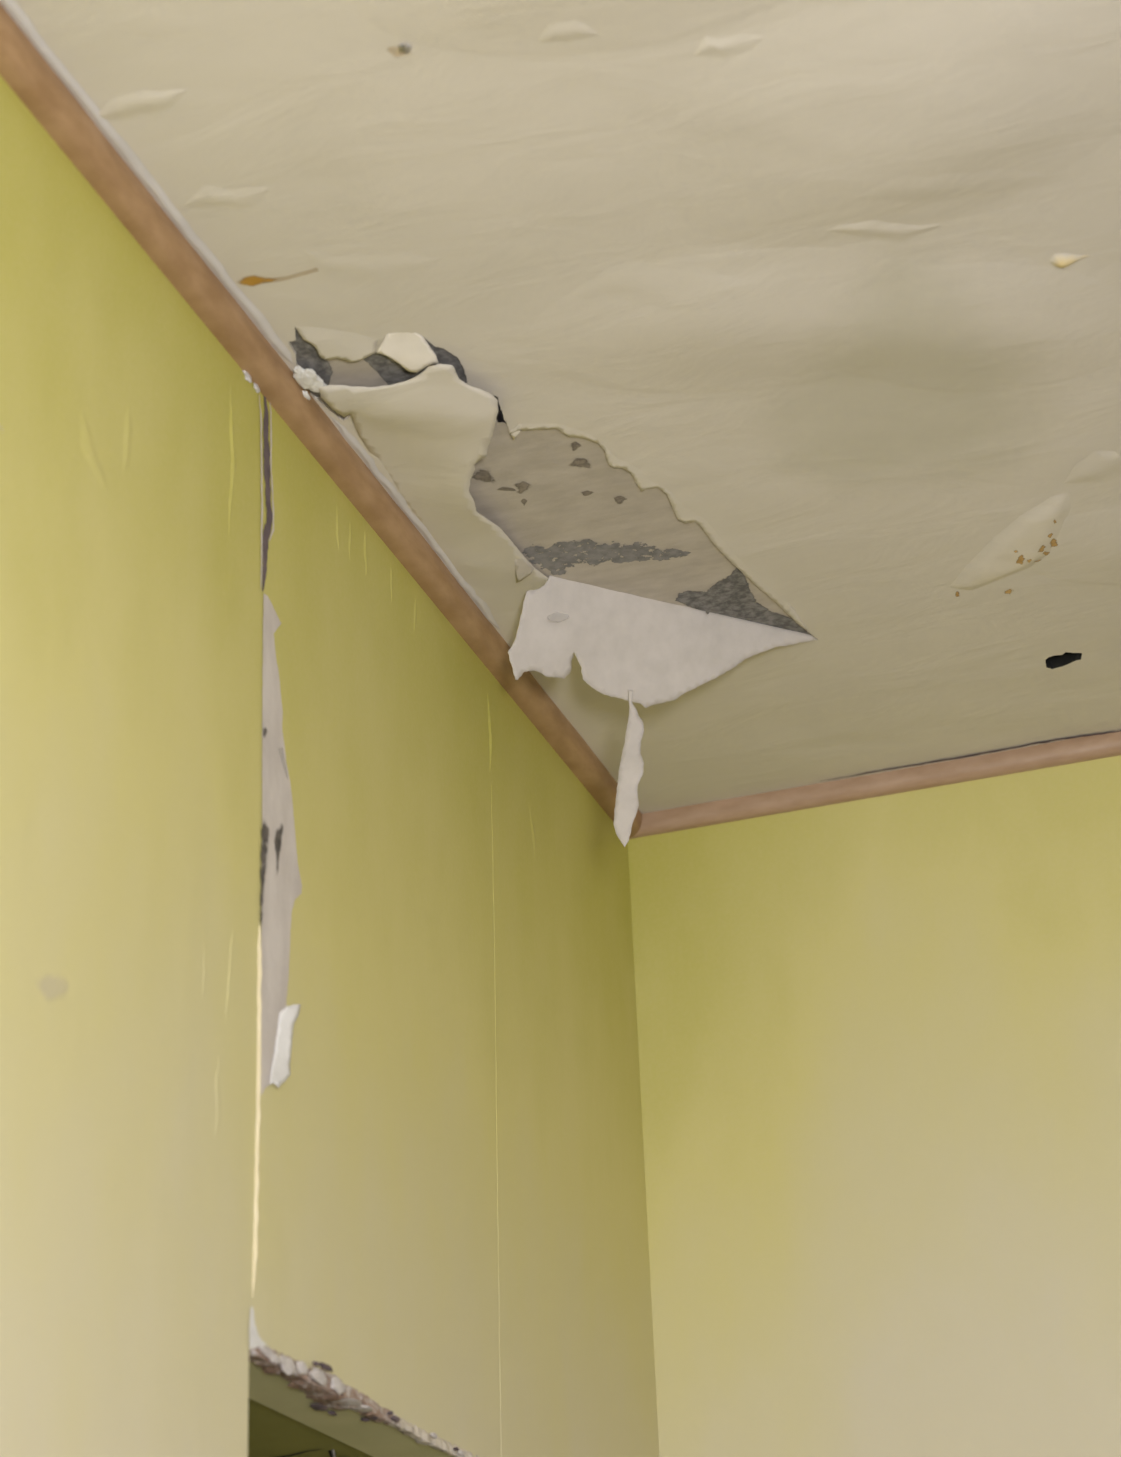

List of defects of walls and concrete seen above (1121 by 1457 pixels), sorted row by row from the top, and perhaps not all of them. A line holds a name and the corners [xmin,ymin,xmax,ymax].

peeling [290,327,467,419]
peeling [469,418,815,847]
flaking render [249,594,480,1457]